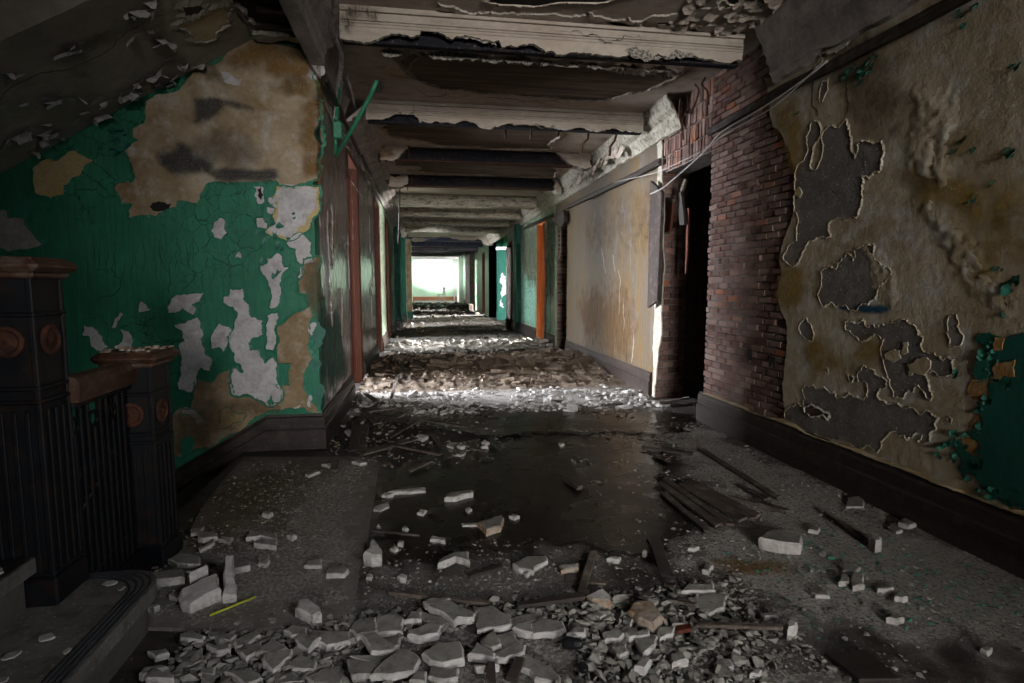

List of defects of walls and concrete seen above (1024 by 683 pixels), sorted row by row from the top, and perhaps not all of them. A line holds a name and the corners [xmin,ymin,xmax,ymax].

peeling [438,0,789,36]
spalling [428,37,695,73]
leakage [195,98,249,123]
leakage [159,144,277,182]
peeling [569,145,624,189]
peeling [0,0,350,460]
flaking render [652,45,1024,516]